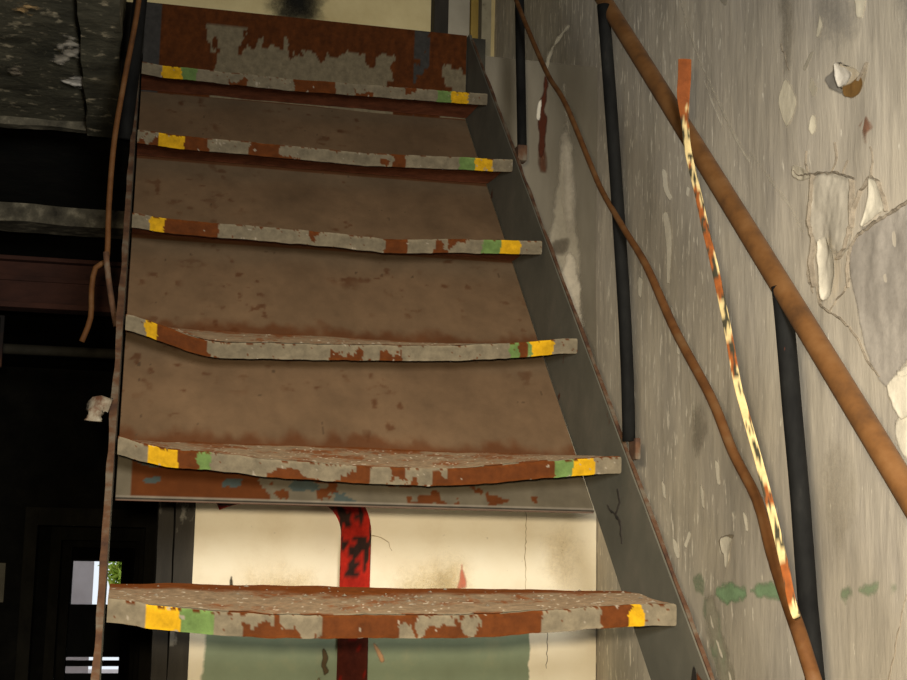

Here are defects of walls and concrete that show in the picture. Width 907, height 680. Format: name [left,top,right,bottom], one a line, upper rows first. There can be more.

spalling [825,62,869,98]
crack [792,142,889,228]
crack [806,255,880,377]
peeling [845,178,907,458]